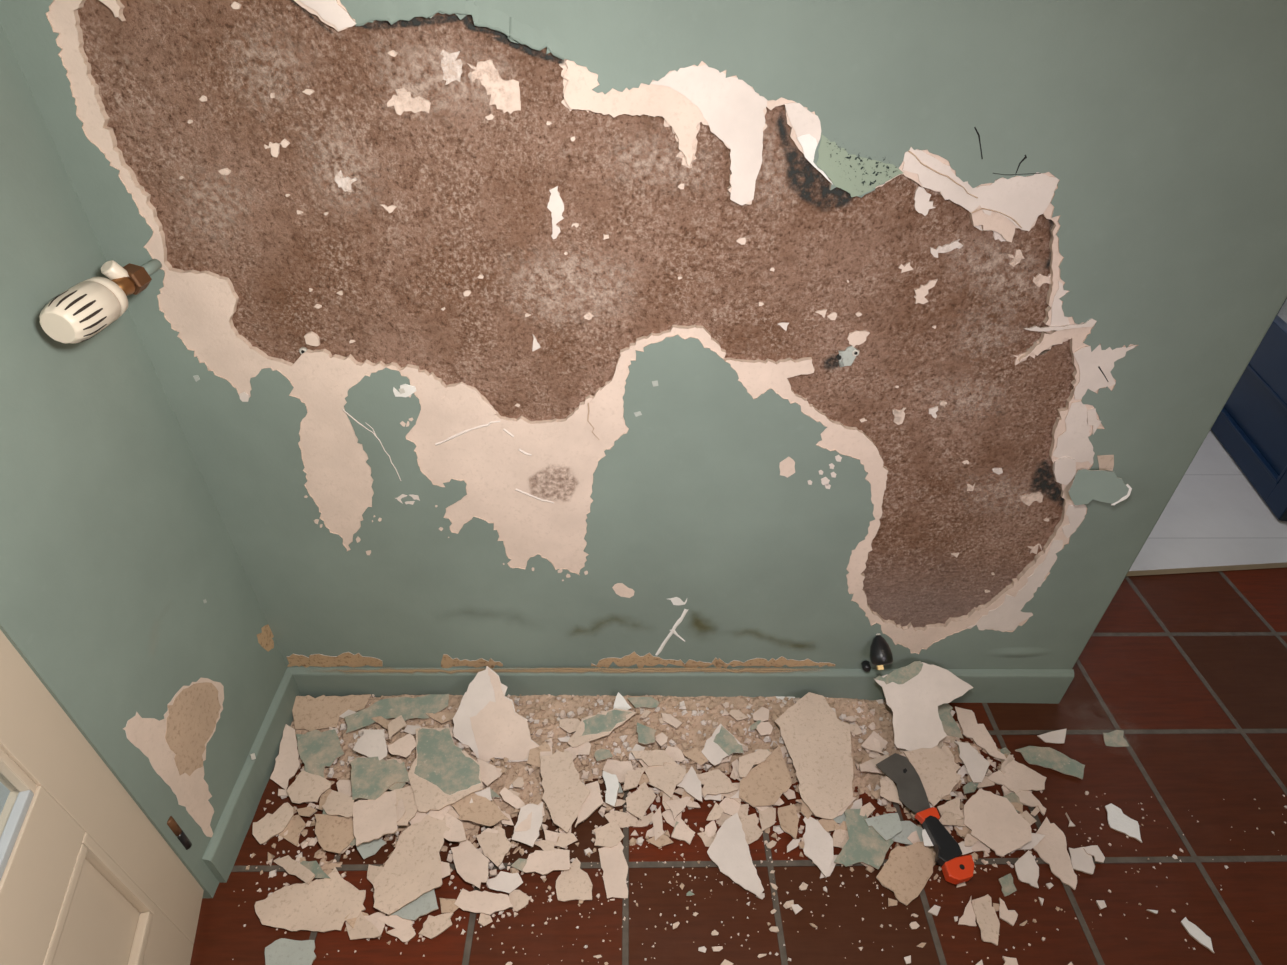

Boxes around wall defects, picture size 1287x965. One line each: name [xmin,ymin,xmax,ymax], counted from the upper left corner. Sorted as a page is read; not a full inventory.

spalling [47,0,1136,906]